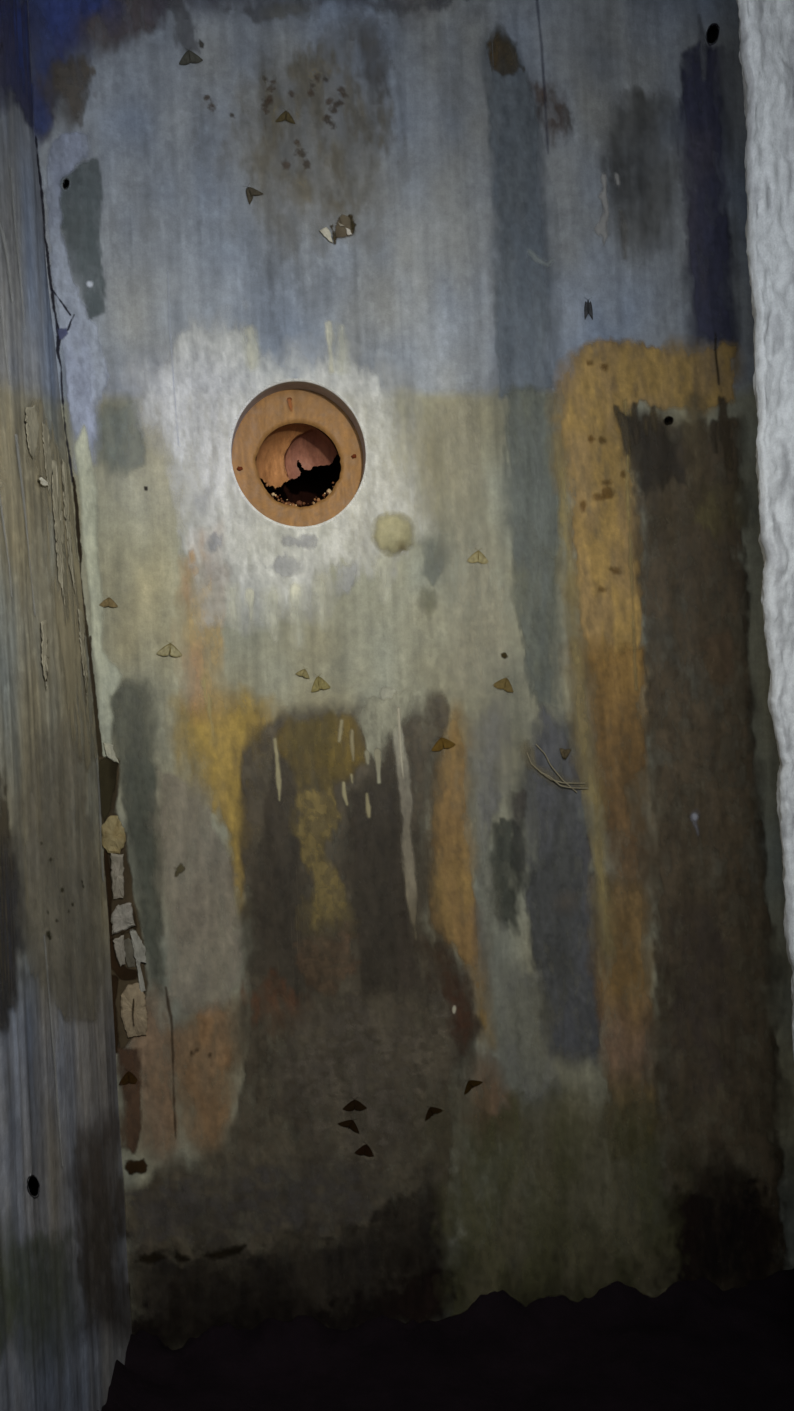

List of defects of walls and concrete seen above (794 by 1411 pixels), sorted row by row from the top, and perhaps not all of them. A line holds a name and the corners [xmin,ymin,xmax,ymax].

crack [35,136,103,757]
flaking render [25,400,148,1053]
rust [182,532,270,898]
damp [0,0,480,1346]
spalling [319,215,356,244]
damp [595,91,654,250]
rust [559,340,737,1149]
damp [614,394,786,1276]
damp [680,23,737,345]